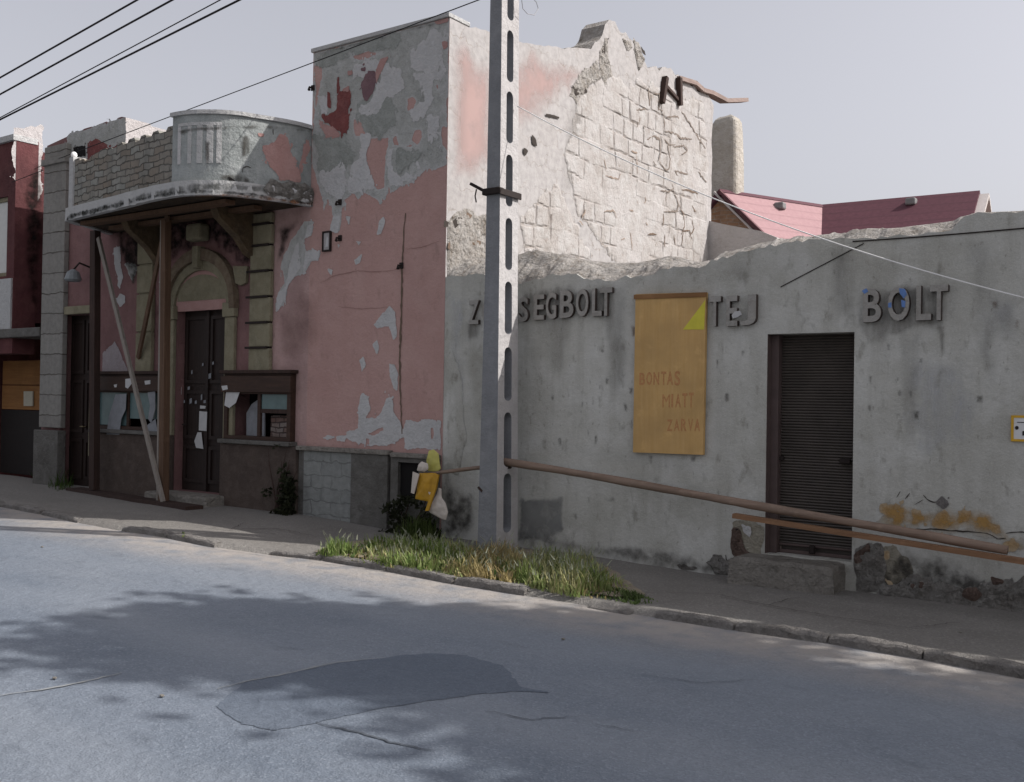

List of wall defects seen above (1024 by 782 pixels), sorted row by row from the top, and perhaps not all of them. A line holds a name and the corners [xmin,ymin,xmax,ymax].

spalling [67,117,126,159]
peeling [258,18,449,248]
peeling [461,58,486,164]
spalling [519,38,709,263]
peeling [275,219,333,312]
spalling [444,208,486,276]
peeling [359,306,397,370]
peeling [323,364,441,450]
spalling [853,543,1024,613]